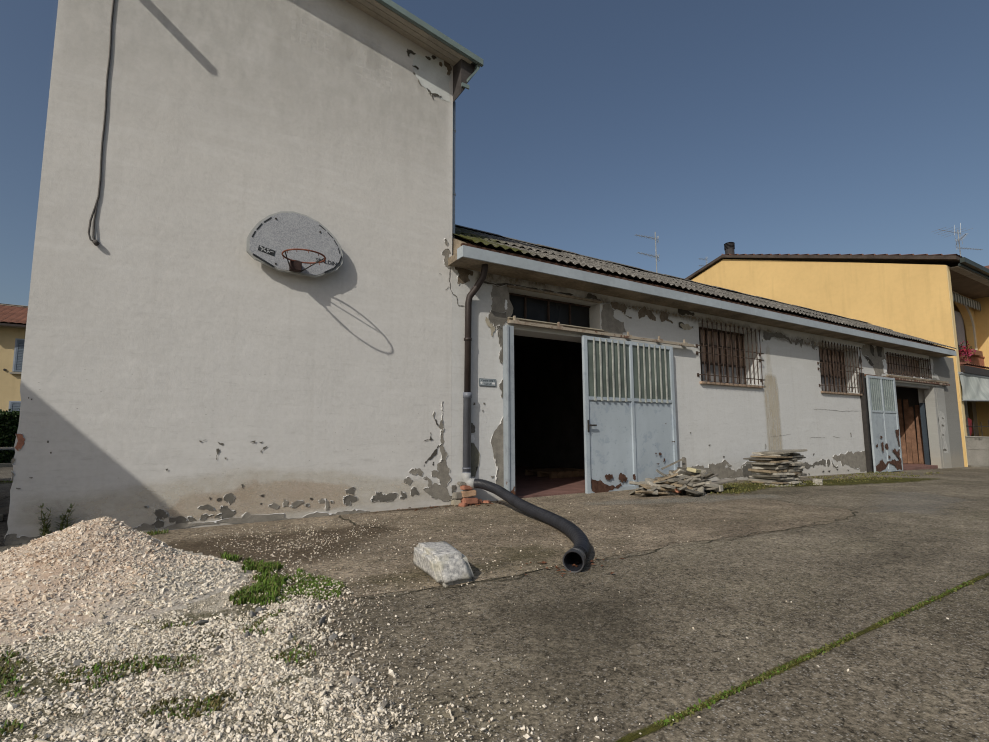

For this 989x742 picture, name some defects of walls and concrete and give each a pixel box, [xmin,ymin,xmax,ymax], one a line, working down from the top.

peeling [406,48,452,102]
peeling [442,238,473,285]
peeling [483,281,695,364]
rust [591,473,636,493]
flaking render [679,456,757,479]
flaking render [805,451,867,475]
rust [876,429,902,472]
flaking render [133,401,562,613]
flaking render [3,531,54,546]